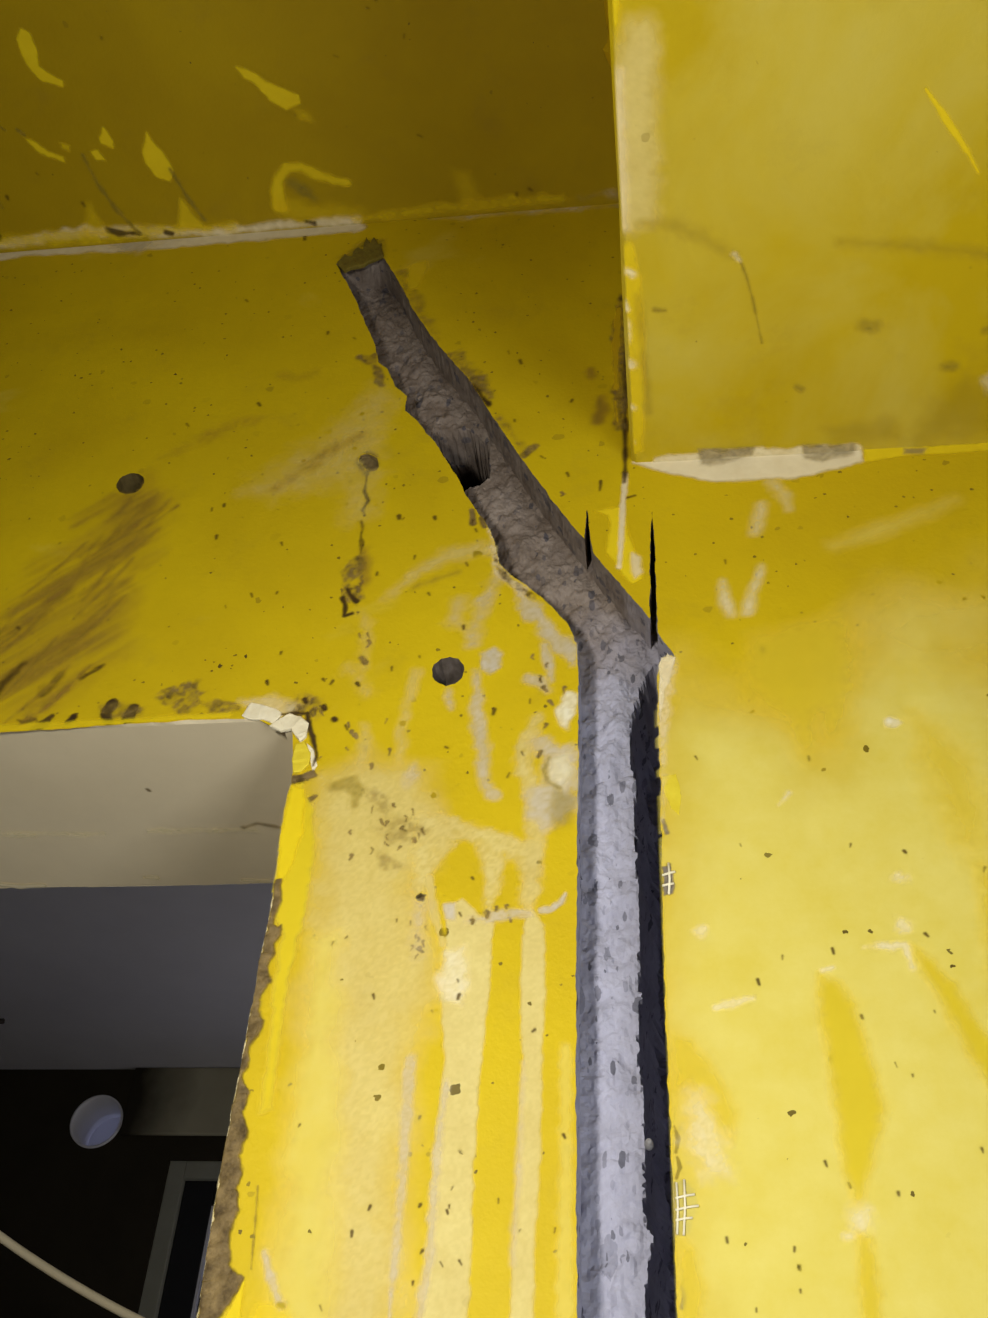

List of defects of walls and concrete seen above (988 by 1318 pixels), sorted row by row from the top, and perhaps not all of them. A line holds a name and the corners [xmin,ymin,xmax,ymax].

flaking render [633,444,863,481]
spalling [198,878,282,1318]
flaking render [242,697,348,784]
peeling [252,769,467,1318]
leakage [411,715,547,1318]
leakage [472,676,499,798]
flaking render [483,893,566,922]
peeling [659,606,988,1318]